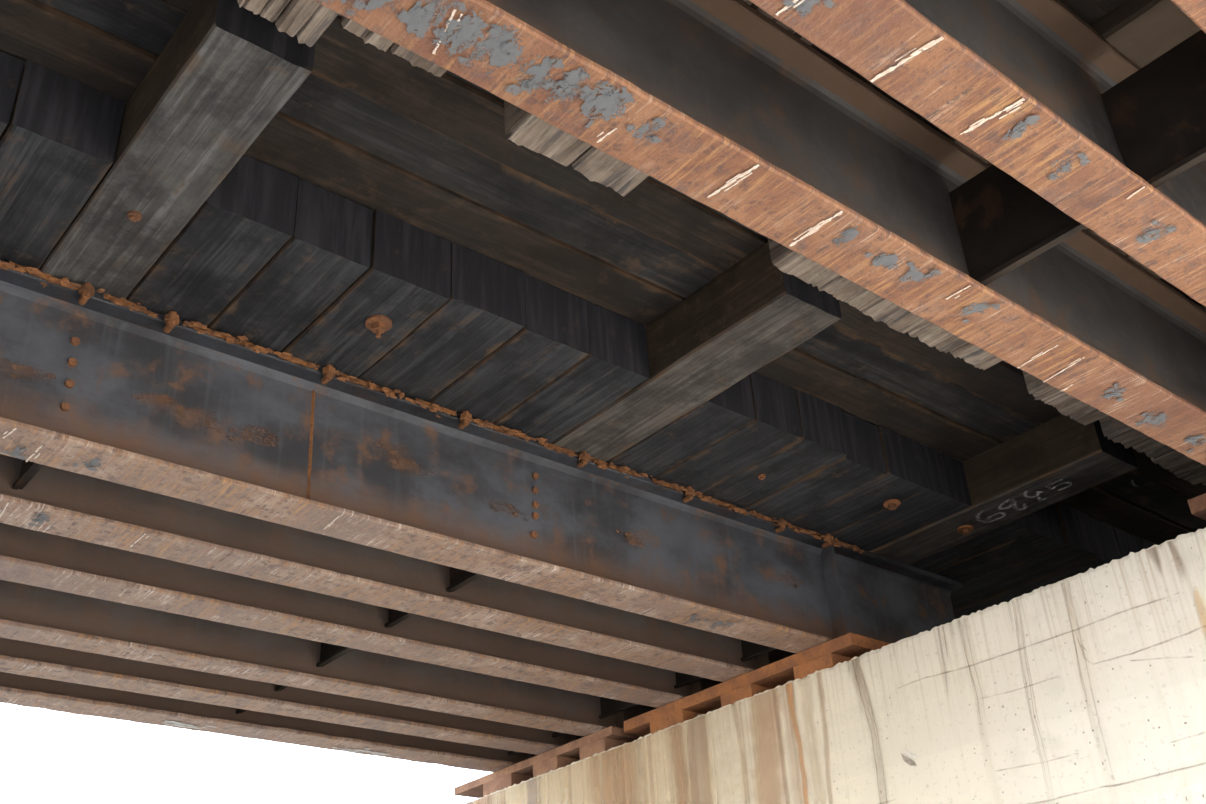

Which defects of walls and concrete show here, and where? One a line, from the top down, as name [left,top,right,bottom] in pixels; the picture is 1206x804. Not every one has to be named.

peeling [319,0,667,144]
peeling [832,227,859,246]
peeling [862,251,942,284]
rust [787,683,808,804]